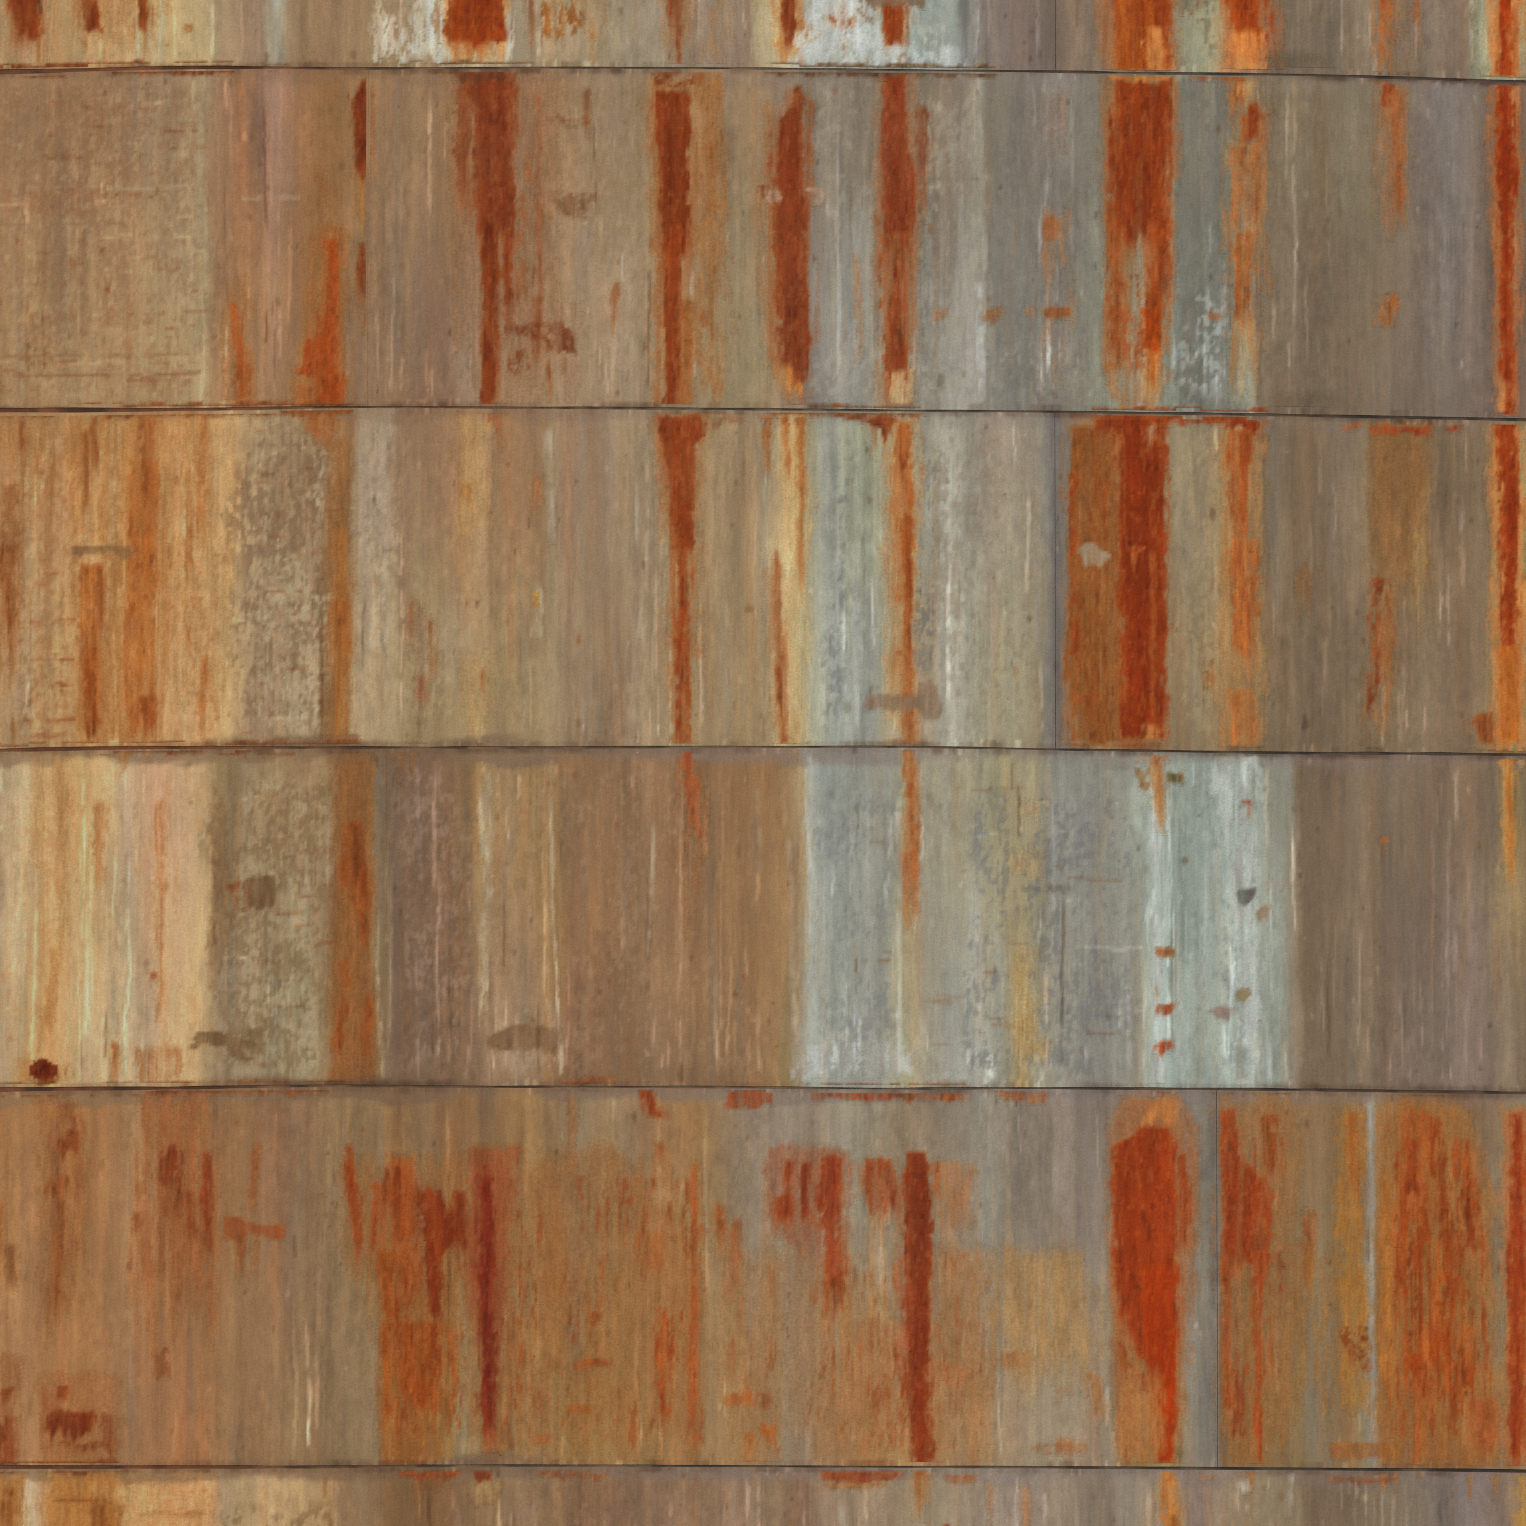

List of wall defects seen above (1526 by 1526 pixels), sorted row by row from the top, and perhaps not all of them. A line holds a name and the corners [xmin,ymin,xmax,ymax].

corrosion [0,0,237,80]
corrosion [0,75,440,1381]
corrosion [458,648,496,743]
corrosion [433,0,608,550]
corrosion [608,278,622,338]
corrosion [636,0,1005,942]
corrosion [987,197,1077,398]
corrosion [1058,0,1288,835]
corrosion [1339,0,1526,889]
corrosion [0,1350,234,1526]
corrosion [331,1075,1526,1526]